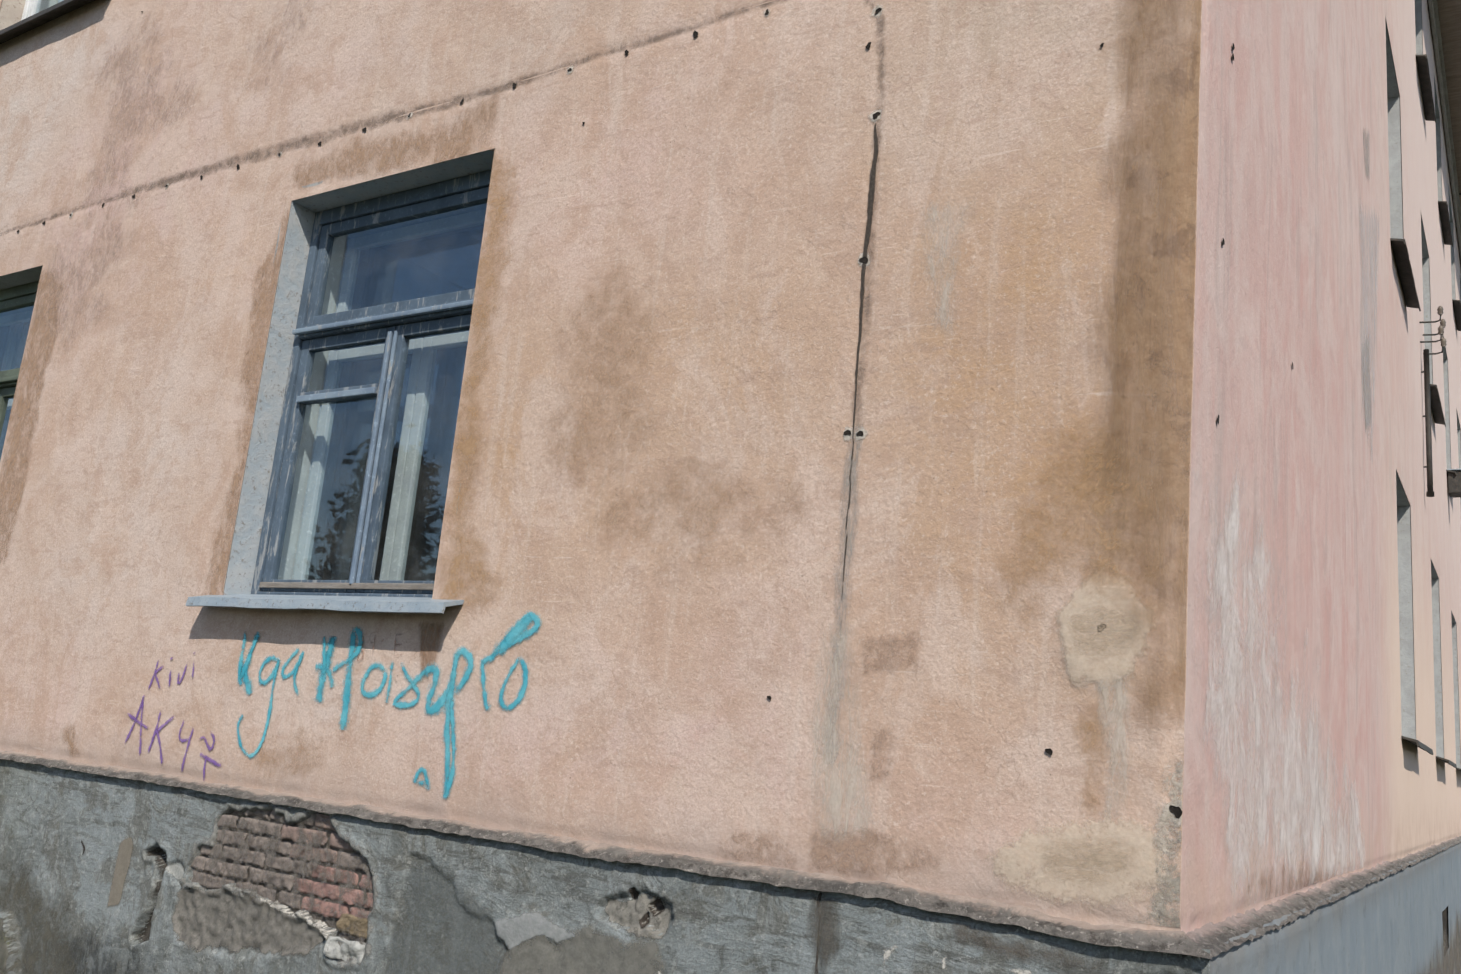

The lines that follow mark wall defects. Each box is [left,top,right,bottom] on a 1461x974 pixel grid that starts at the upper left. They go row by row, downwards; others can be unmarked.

damp [1024,0,1202,609]
damp [1149,631,1186,710]
flaking render [138,803,378,968]
flaking render [605,887,671,940]
crack [812,892,838,974]